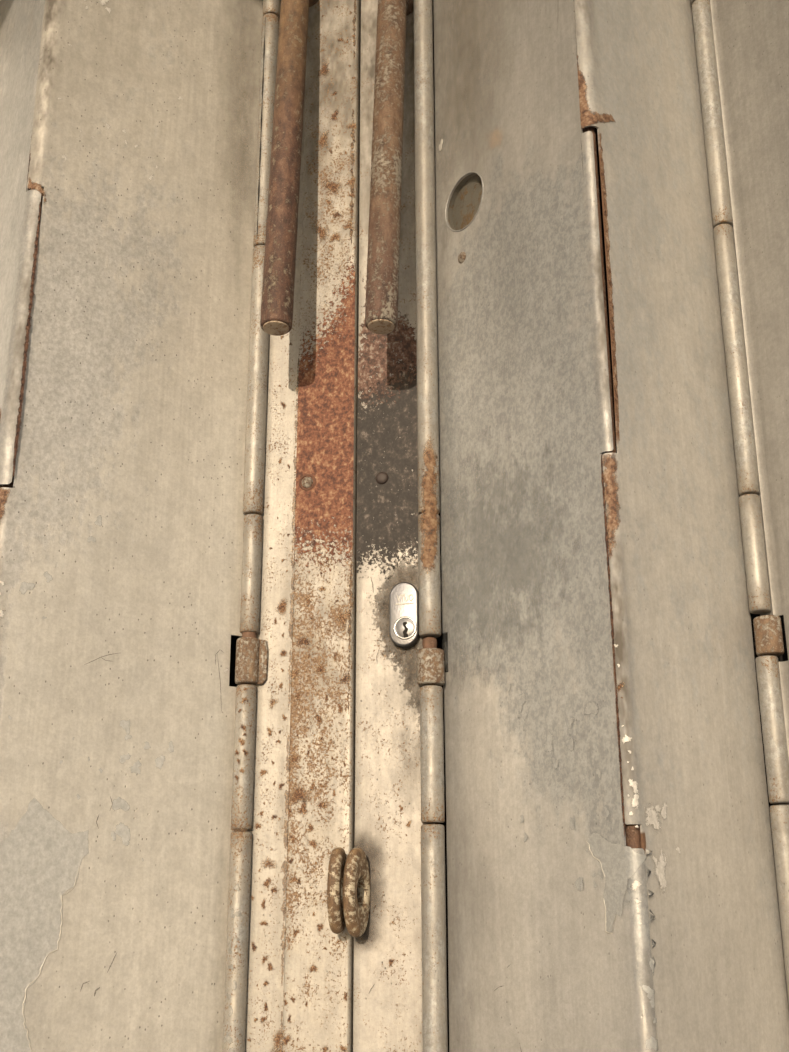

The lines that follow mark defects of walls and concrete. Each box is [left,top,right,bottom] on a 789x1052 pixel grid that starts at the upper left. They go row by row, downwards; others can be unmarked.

corrosion [12,135,46,477]
corrosion [577,56,620,441]
corrosion [0,488,9,519]
corrosion [230,98,417,986]
water stain [356,360,419,581]
corrosion [420,439,439,573]
corrosion [601,454,625,836]
peeling [587,833,681,934]
peeling [622,725,667,834]
corrosion [272,998,308,1052]